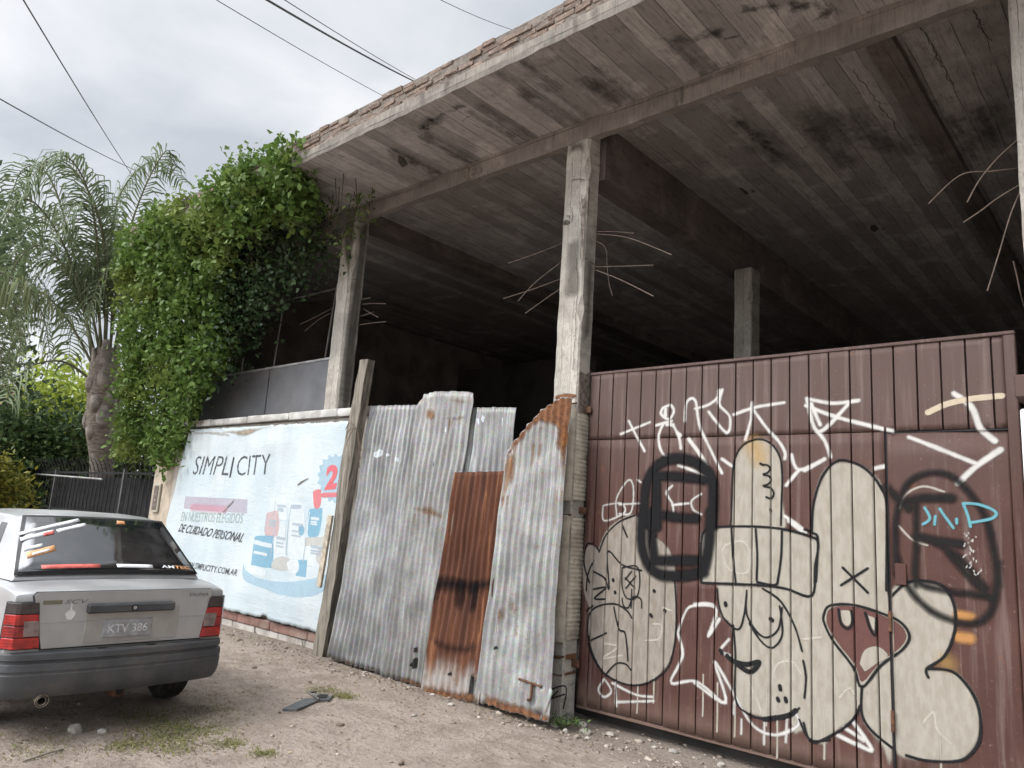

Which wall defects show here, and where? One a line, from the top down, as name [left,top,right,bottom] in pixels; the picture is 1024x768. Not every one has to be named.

crack [920,27,954,84]
rust [505,393,577,489]